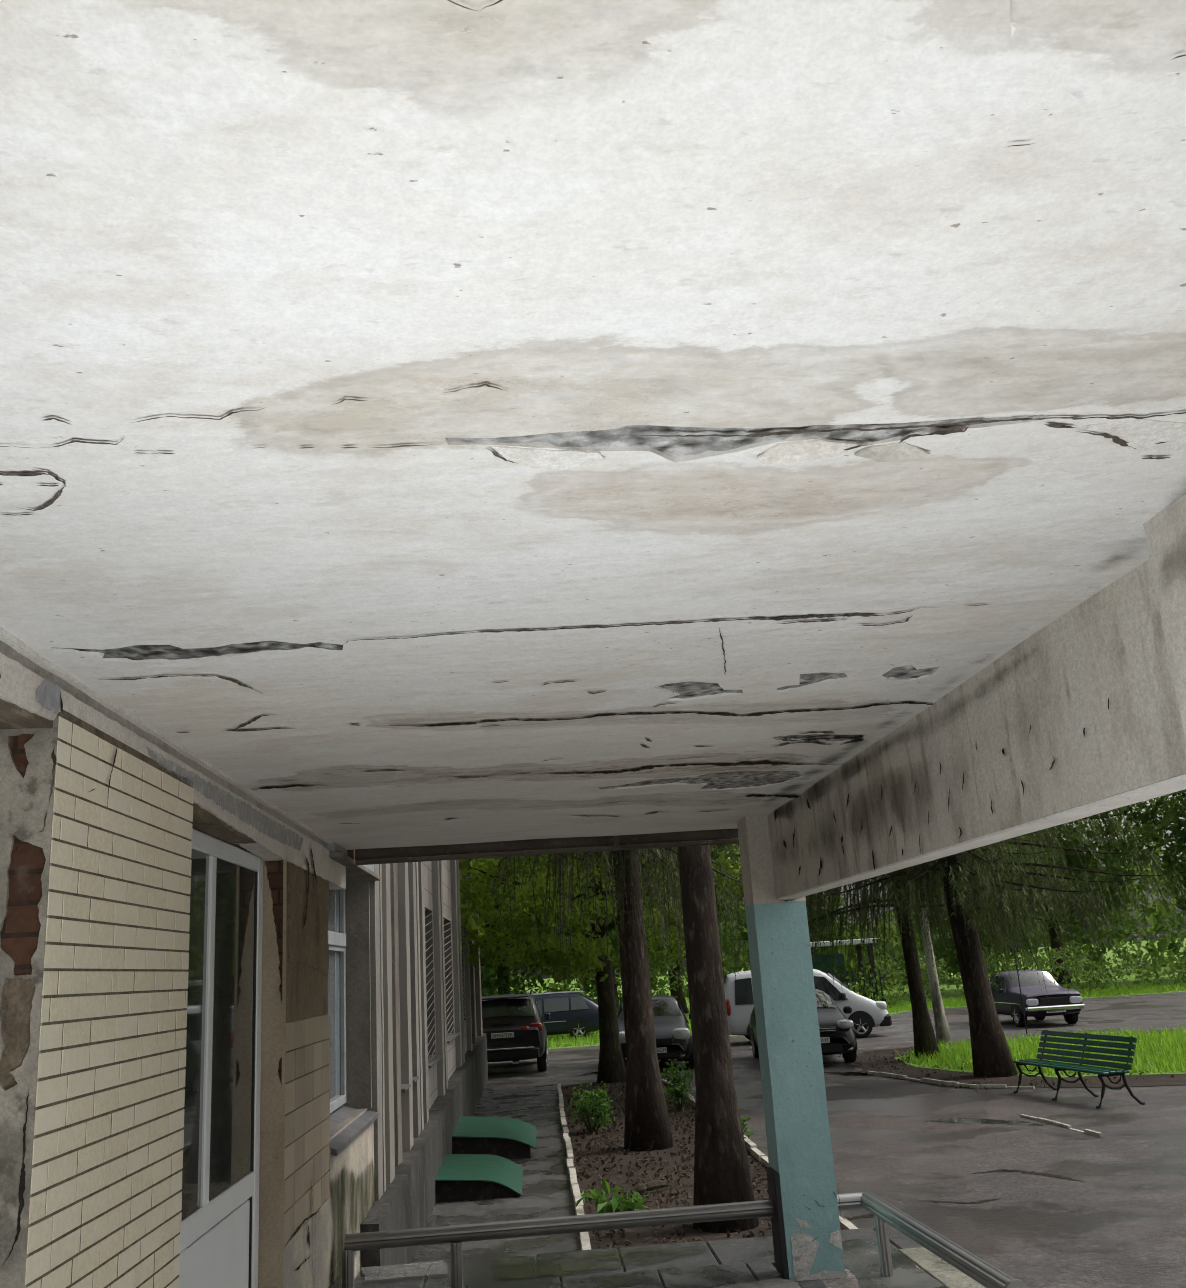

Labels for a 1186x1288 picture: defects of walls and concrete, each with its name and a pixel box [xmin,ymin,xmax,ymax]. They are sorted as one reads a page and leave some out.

crack [302,442,432,450]
crack [613,412,1186,459]
crack [343,607,939,674]
spalling [658,681,743,699]
spalling [9,734,34,777]
crack [351,681,933,812]
crack [251,783,315,791]
water stain [775,757,866,817]
spalling [0,835,46,1090]
peeling [791,1218,847,1281]